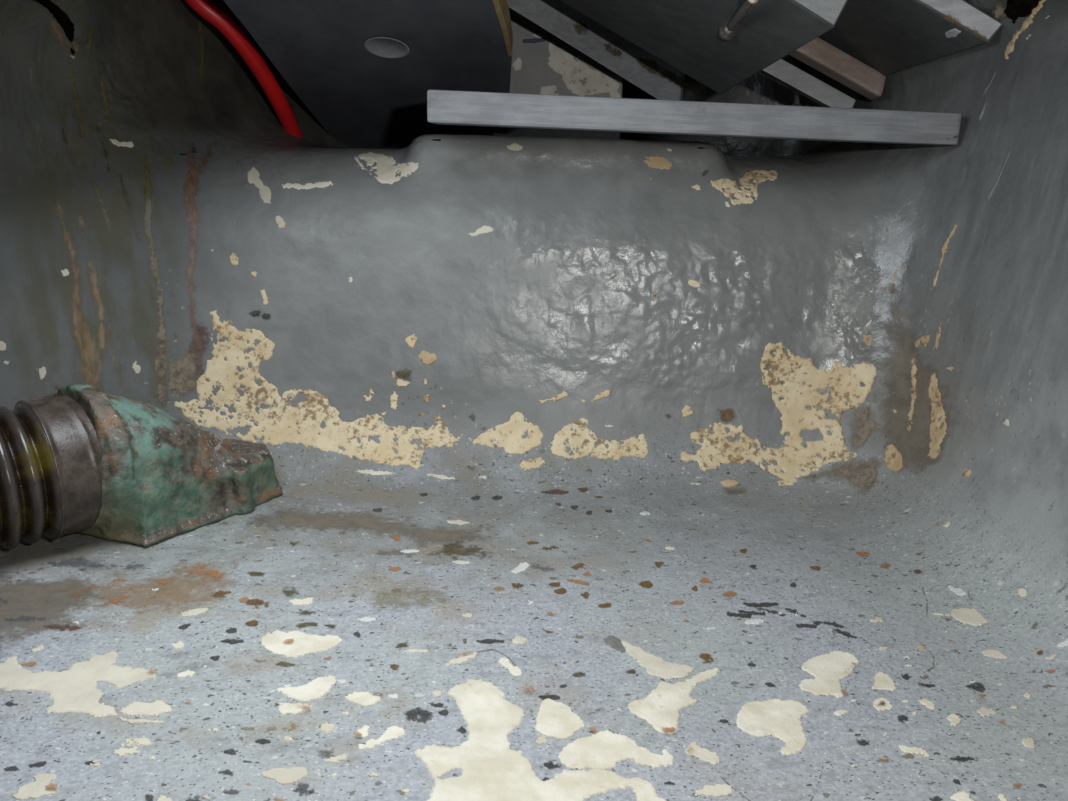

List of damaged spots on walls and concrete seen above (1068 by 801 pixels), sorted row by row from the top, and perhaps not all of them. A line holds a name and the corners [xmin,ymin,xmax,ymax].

crack [33,0,75,55]
peeling [995,0,1048,59]
peeling [354,151,419,184]
peeling [691,169,778,207]
peeling [174,310,461,480]
peeling [473,412,648,471]
peeling [681,342,876,486]
leakage [812,459,879,488]
leakage [852,303,948,470]
peeling [0,651,172,757]
peeling [414,679,674,801]
peeling [736,650,859,755]